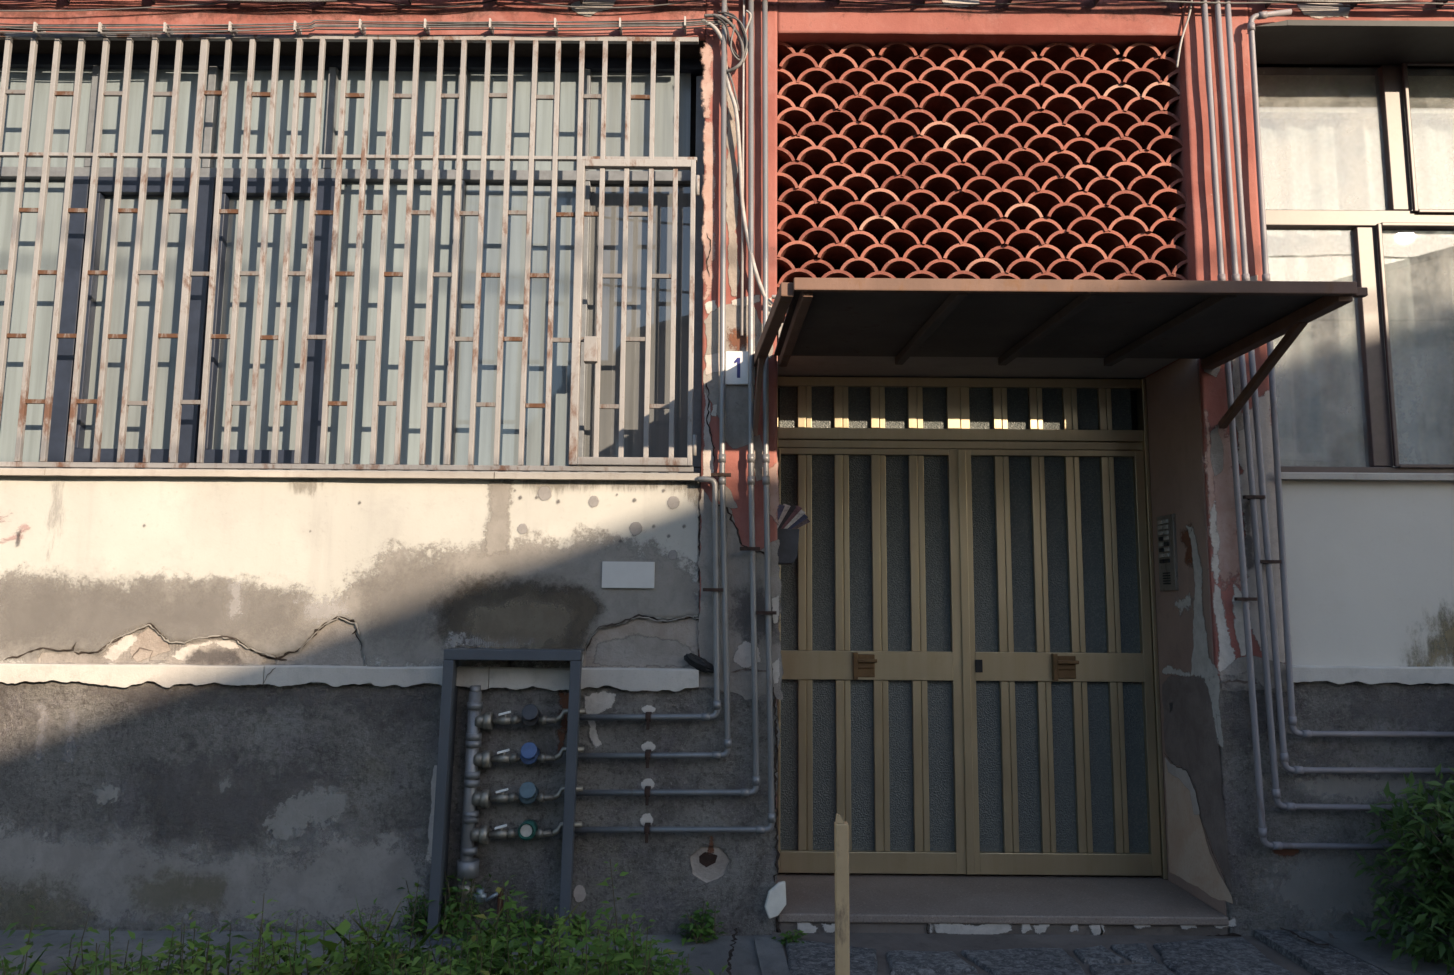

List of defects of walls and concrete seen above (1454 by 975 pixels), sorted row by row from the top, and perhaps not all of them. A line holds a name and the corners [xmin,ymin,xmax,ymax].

peeling [583,44,784,883]
water stain [0,480,700,668]
peeling [1162,357,1303,753]
flaking render [4,616,364,666]
water stain [1408,613,1454,667]
water stain [95,682,437,725]
water stain [1283,737,1439,804]
water stain [0,735,431,932]
flaking render [1164,753,1236,930]
peeling [776,918,835,933]
peeling [928,923,1050,935]
peeling [1069,924,1105,935]